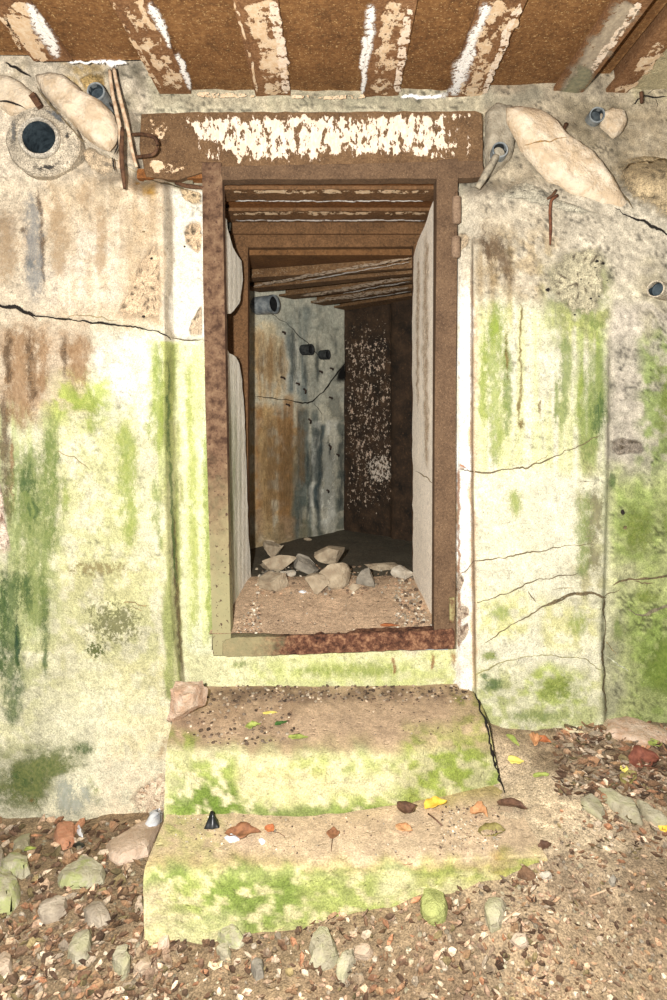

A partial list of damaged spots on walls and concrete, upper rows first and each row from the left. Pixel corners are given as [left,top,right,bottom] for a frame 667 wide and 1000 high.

peeling [234,0,290,95]
peeling [370,2,413,95]
peeling [459,0,522,97]
peeling [186,113,471,163]
crack [616,188,667,235]
crack [0,304,199,341]
damp [0,332,69,543]
damp [504,351,512,435]
crack [460,434,601,474]
damp [166,371,184,669]
damp [577,495,603,574]
crack [472,574,667,793]